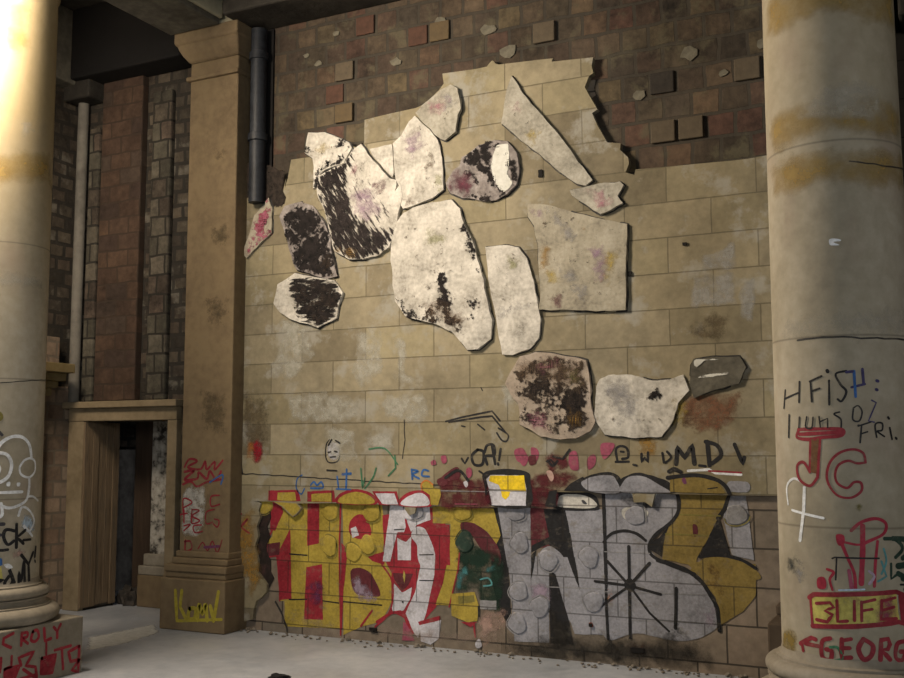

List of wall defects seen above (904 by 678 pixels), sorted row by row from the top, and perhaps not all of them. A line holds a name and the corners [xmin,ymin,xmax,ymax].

peeling [244,76,690,439]